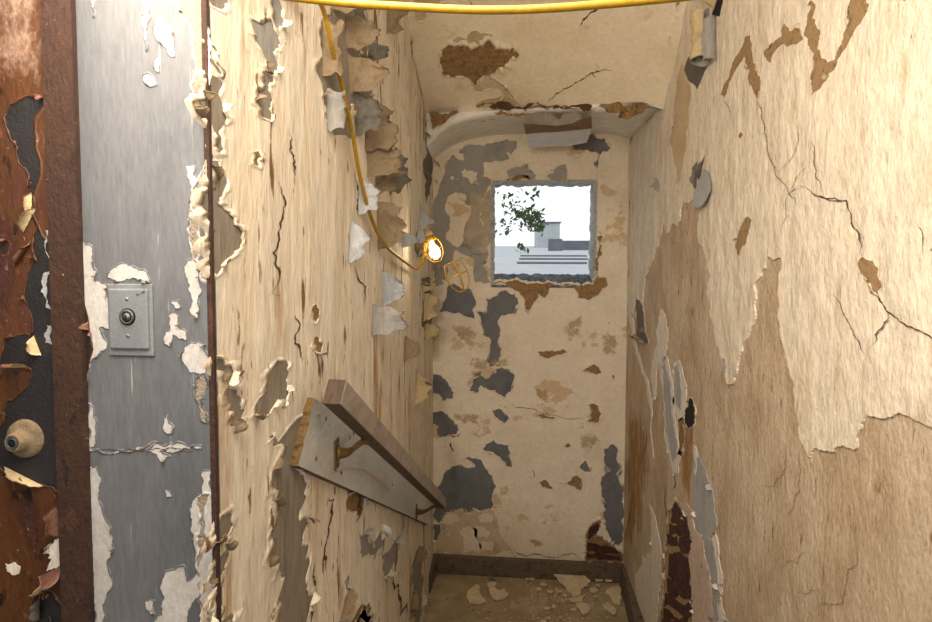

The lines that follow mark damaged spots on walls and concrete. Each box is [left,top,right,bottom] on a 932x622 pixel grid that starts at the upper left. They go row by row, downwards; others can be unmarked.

corrosion [0,0,32,61]
peeling [163,0,297,433]
peeling [309,0,609,425]
crack [757,103,862,256]
peeling [78,242,151,385]
peeling [436,0,932,622]
crack [833,283,932,352]
peeling [87,403,203,463]
peeling [90,466,115,622]
peeling [145,469,244,622]
peeling [259,413,322,622]
peeling [410,439,514,622]